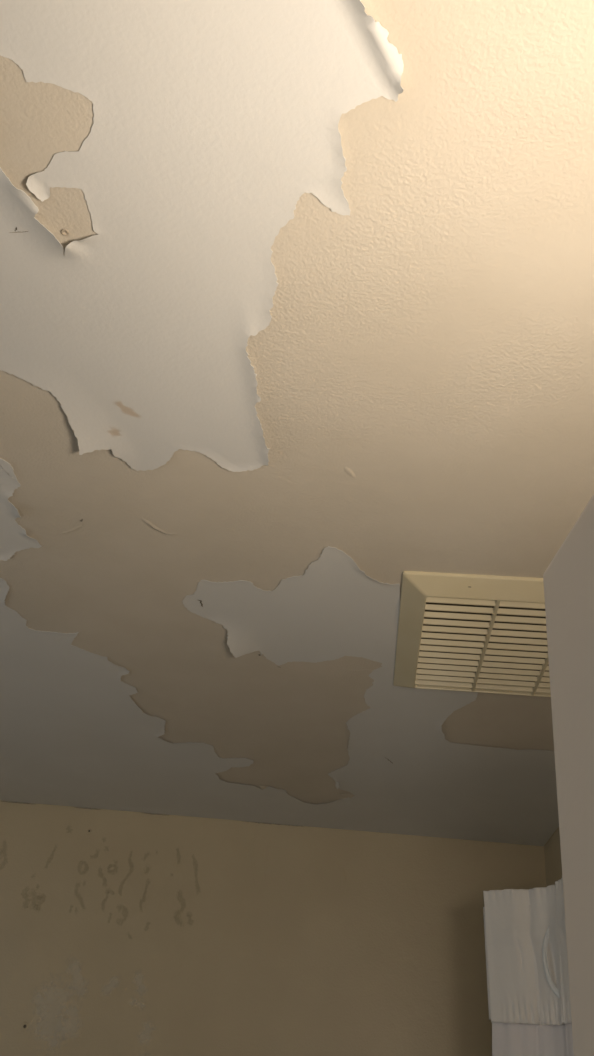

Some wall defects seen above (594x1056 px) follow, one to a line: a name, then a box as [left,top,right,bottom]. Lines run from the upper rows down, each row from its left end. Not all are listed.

peeling [0,0,559,846]